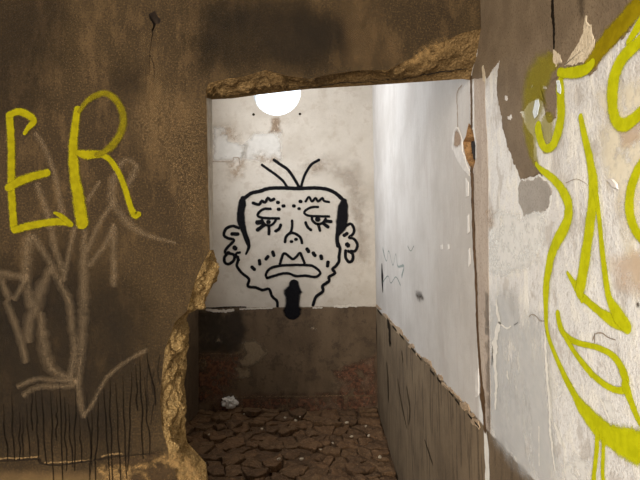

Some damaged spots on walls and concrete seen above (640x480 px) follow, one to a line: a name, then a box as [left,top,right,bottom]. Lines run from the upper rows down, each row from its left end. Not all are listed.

crack [549,0,557,50]
peeling [206,0,632,216]
flaking render [617,85,640,118]
flaking render [602,123,640,202]
flaking render [629,176,640,257]
flaking render [98,250,272,480]